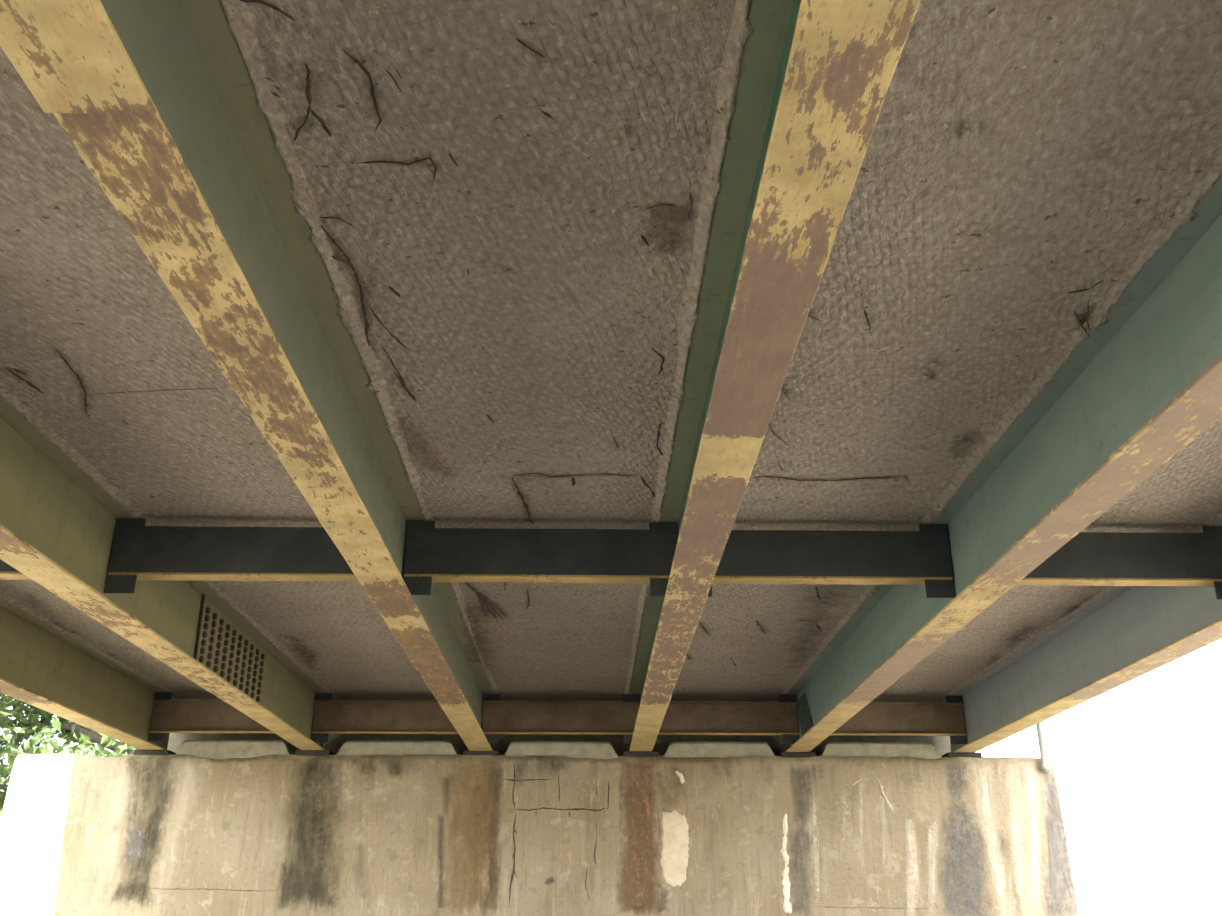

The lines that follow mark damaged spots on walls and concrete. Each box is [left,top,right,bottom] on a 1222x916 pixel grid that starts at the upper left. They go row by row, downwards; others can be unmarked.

crack [239,0,296,22]
crack [265,63,331,141]
crack [342,48,402,131]
crack [362,153,458,184]
crack [641,192,693,246]
crack [320,217,411,397]
crack [651,347,665,375]
crack [655,423,663,456]
crack [512,438,655,524]
damp [127,760,165,895]
damp [283,761,331,898]